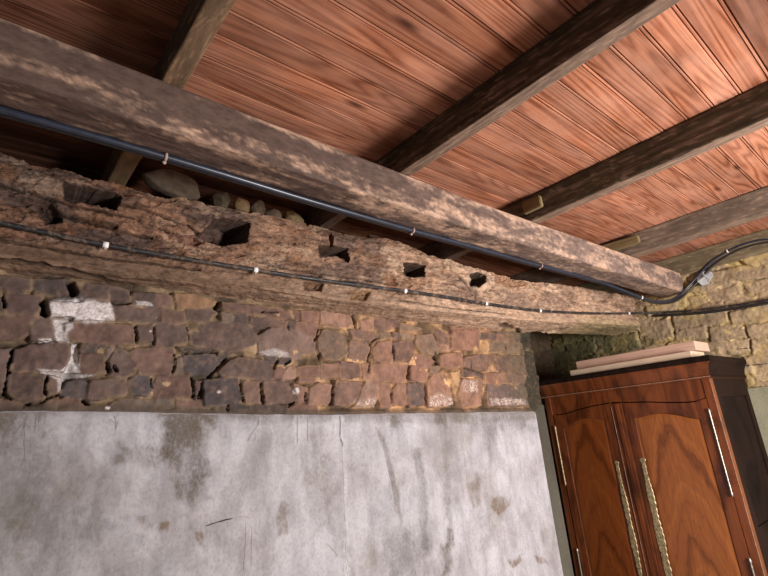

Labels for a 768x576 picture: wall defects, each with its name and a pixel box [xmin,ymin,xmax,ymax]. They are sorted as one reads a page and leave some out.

damp [41,299,114,373]